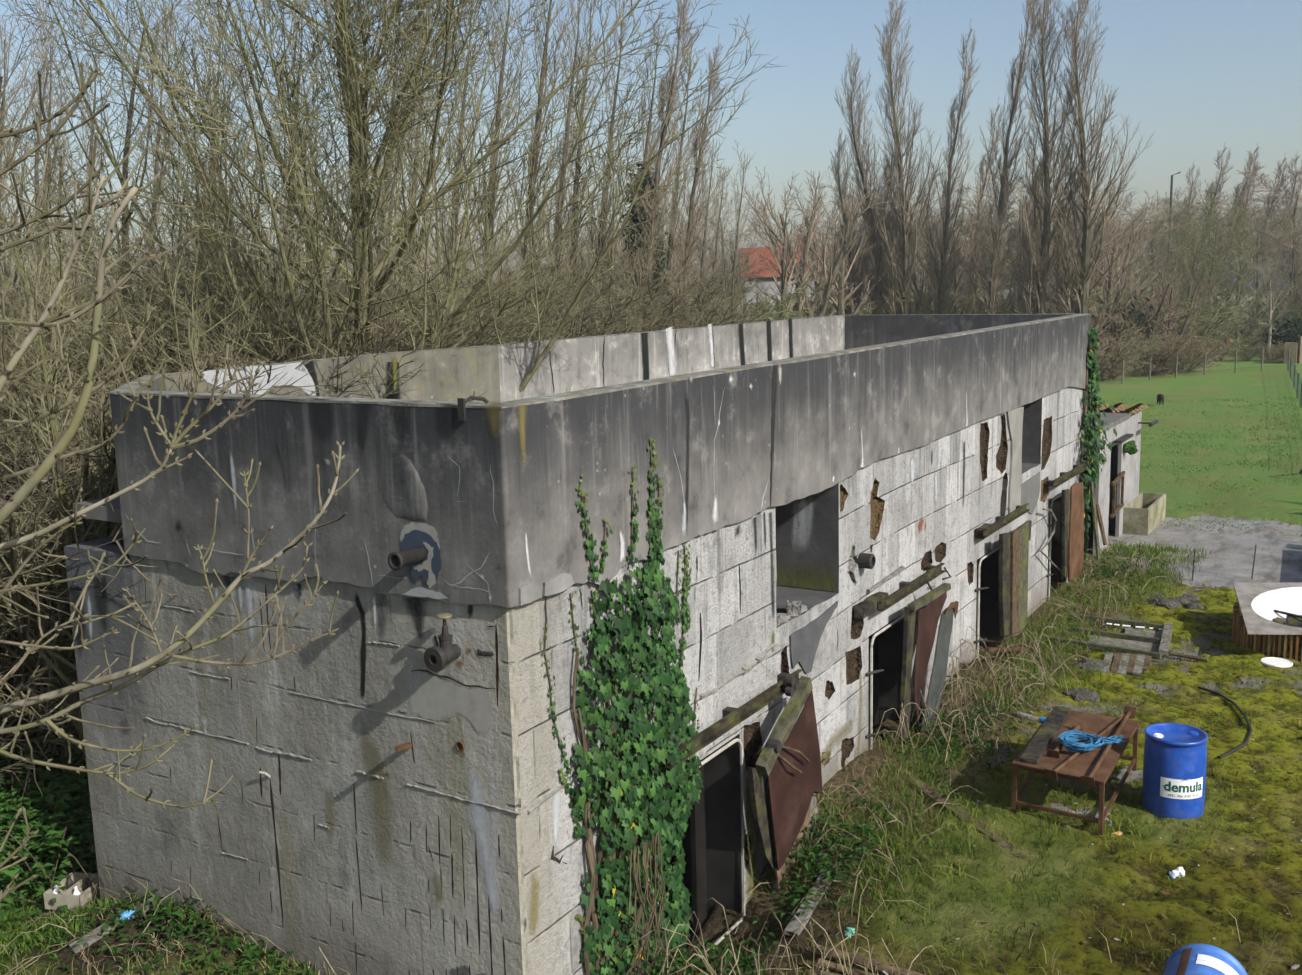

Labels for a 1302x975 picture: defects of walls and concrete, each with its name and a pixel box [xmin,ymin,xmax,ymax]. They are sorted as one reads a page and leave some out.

spalling [840,484,848,513]
spalling [848,479,885,586]
spalling [980,414,1008,481]
spalling [1040,416,1052,503]
spalling [825,601,864,700]